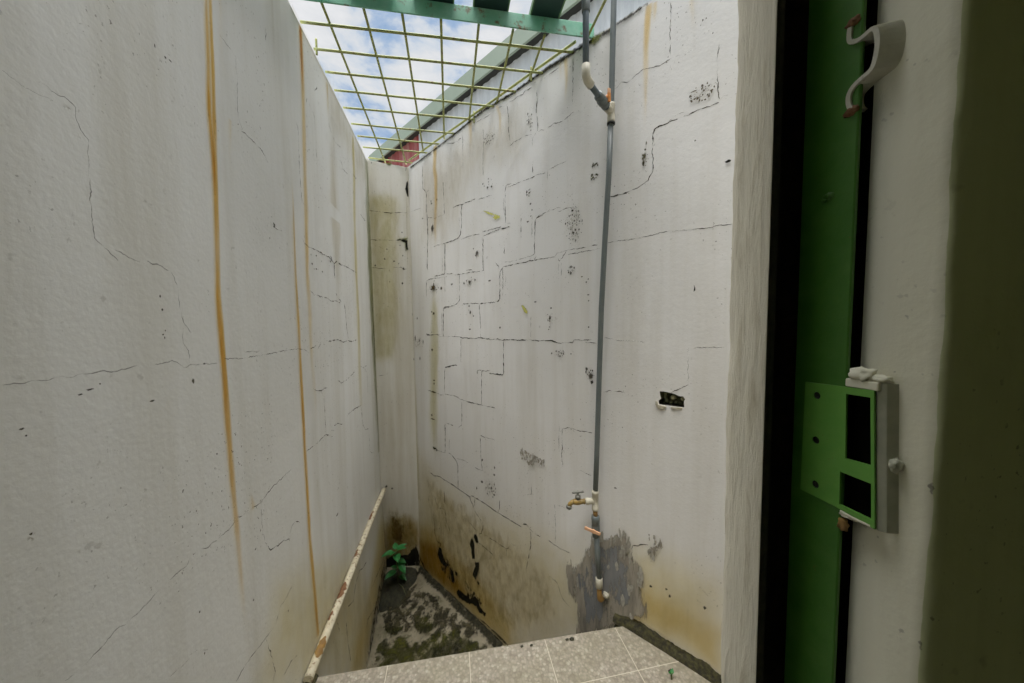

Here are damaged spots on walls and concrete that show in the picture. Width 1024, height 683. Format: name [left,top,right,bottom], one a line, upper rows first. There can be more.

crack [611,3,723,197]
crack [2,67,731,600]
spalling [655,391,685,410]
water stain [438,534,506,645]
peeling [566,528,647,634]